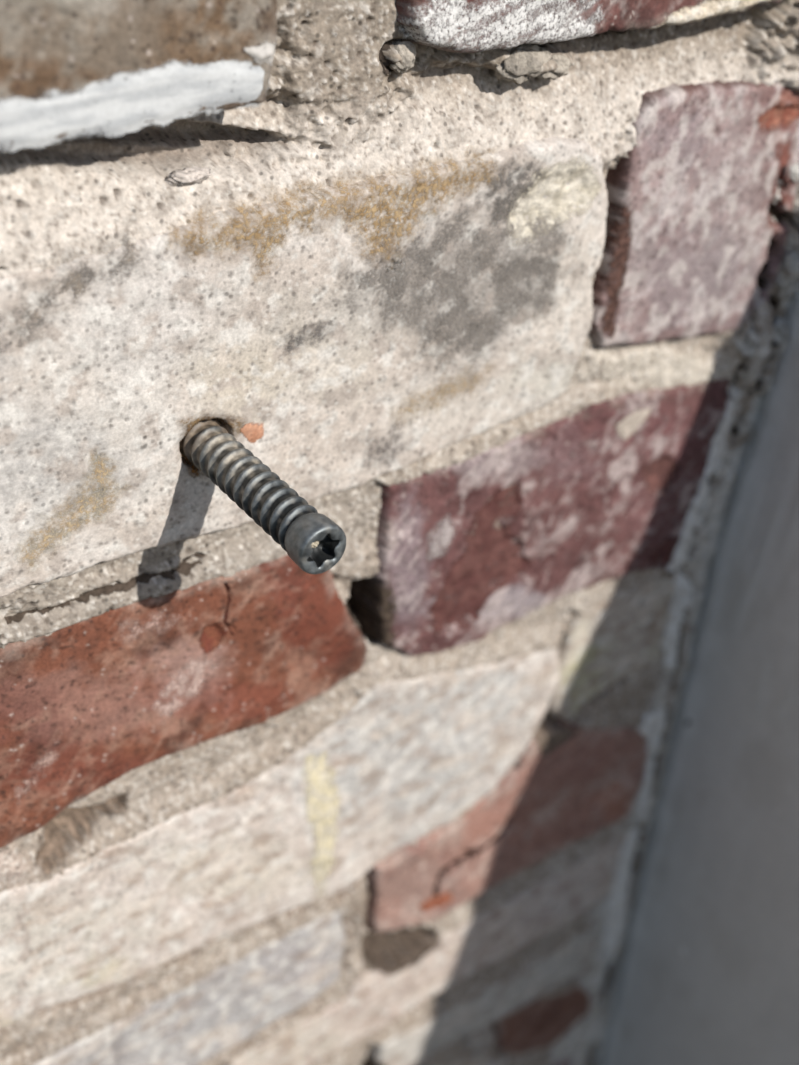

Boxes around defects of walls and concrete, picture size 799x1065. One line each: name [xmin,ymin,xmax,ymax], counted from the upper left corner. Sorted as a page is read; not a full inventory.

spalling [758,101,799,132]
spalling [767,141,799,246]
crack [5,553,206,624]
crack [224,583,235,635]
crack [433,816,511,896]